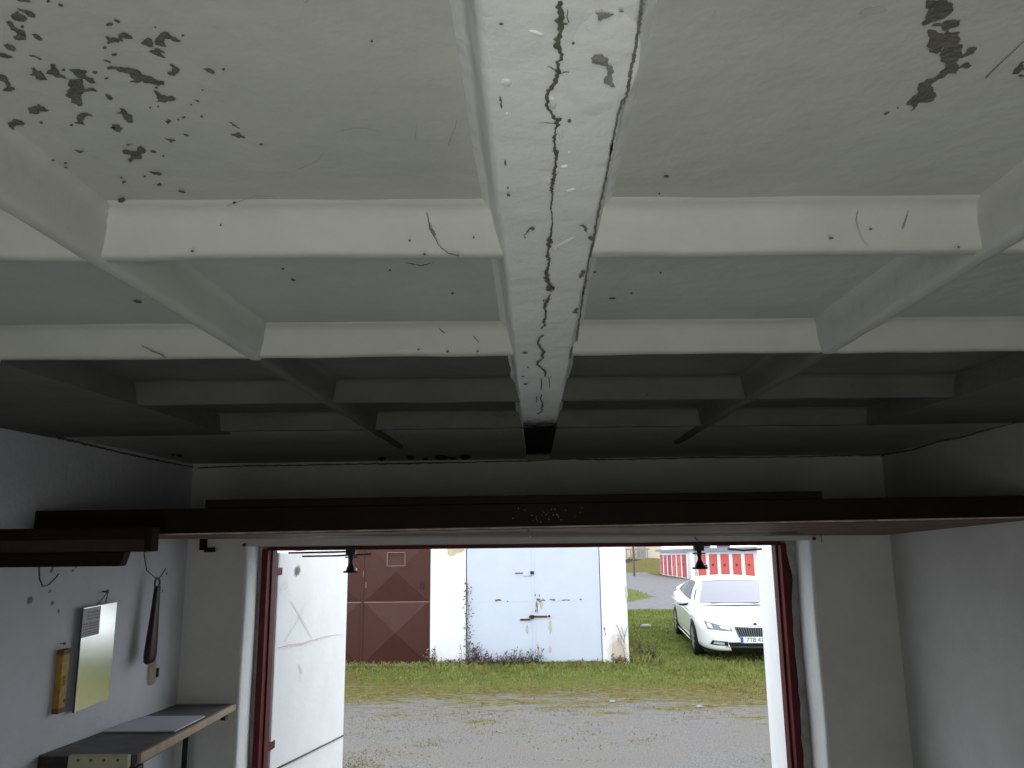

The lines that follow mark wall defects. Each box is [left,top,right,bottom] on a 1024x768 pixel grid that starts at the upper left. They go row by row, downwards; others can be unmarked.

peeling [0,0,42,59]
peeling [595,10,624,21]
peeling [0,74,15,92]
peeling [29,19,184,132]
peeling [591,54,615,88]
peeling [884,0,977,115]
peeling [8,104,49,130]
peeling [122,144,164,163]
crack [536,0,644,414]
crack [426,212,459,257]